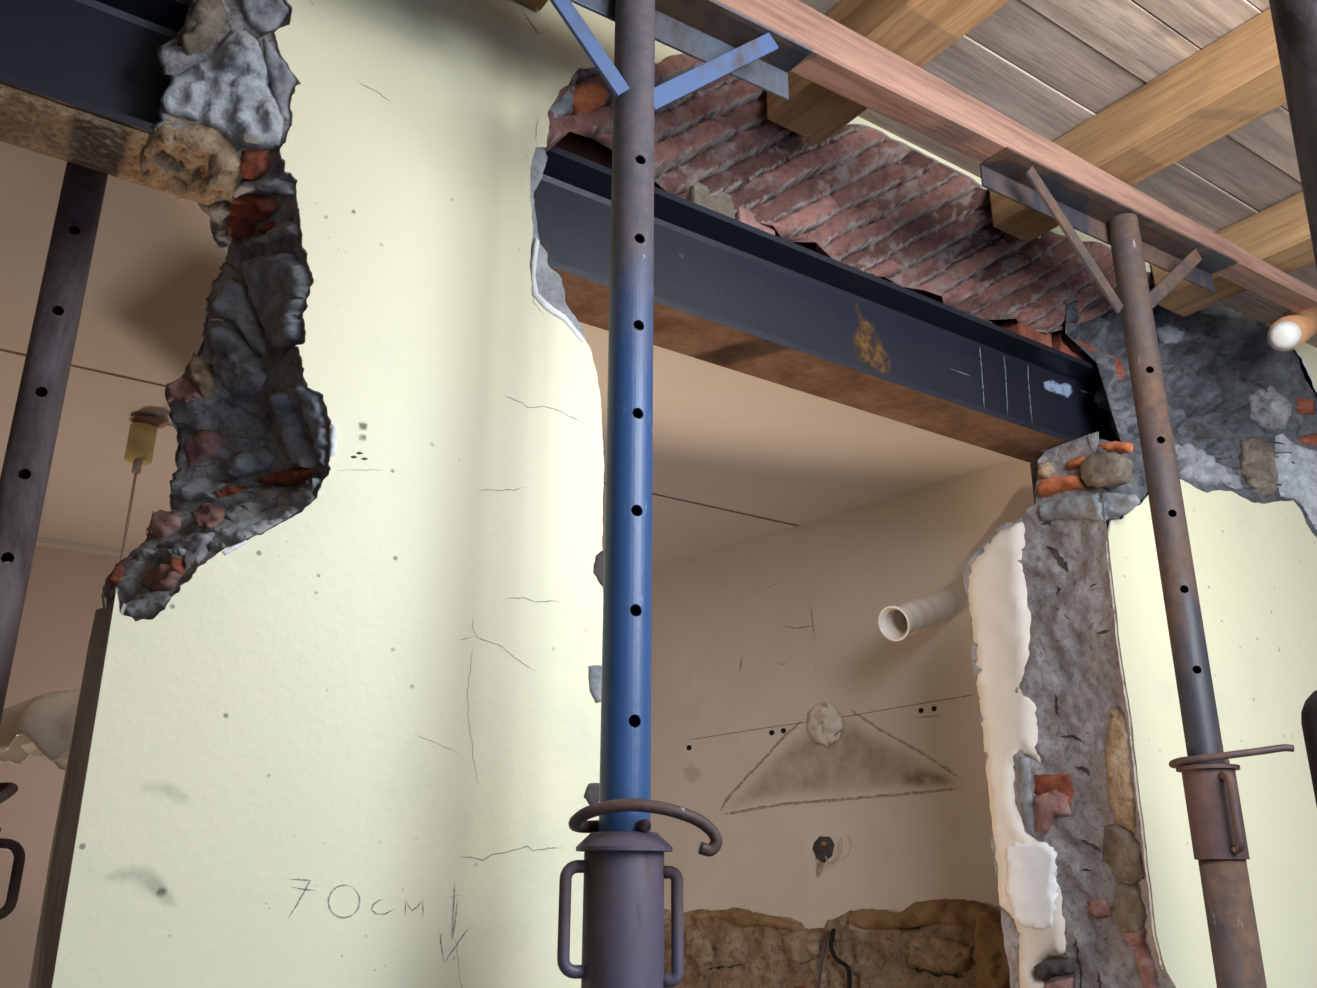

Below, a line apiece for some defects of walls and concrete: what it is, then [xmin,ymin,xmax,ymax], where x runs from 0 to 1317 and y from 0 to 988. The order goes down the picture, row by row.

flaking render [655,55,704,87]
spalling [101,0,338,622]
flaking render [530,67,613,342]
rust [855,321,888,372]
flaking render [654,74,1148,501]
spalling [1147,272,1317,537]
crack [415,617,535,783]
crack [466,846,562,861]
peeling [664,899,1010,988]